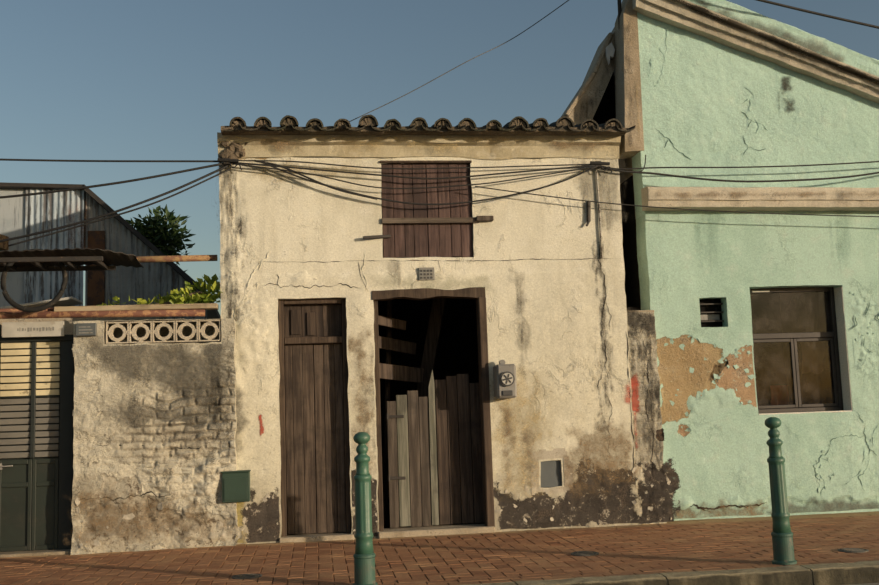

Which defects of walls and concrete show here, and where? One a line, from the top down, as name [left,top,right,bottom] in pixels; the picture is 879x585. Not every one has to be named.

leakage [673,0,879,86]
crack [263,259,568,291]
flaking render [75,415,280,553]
leakage [564,374,663,492]
crack [589,237,660,491]
leakage [627,308,656,360]
peeling [656,334,757,441]
crack [814,413,879,497]